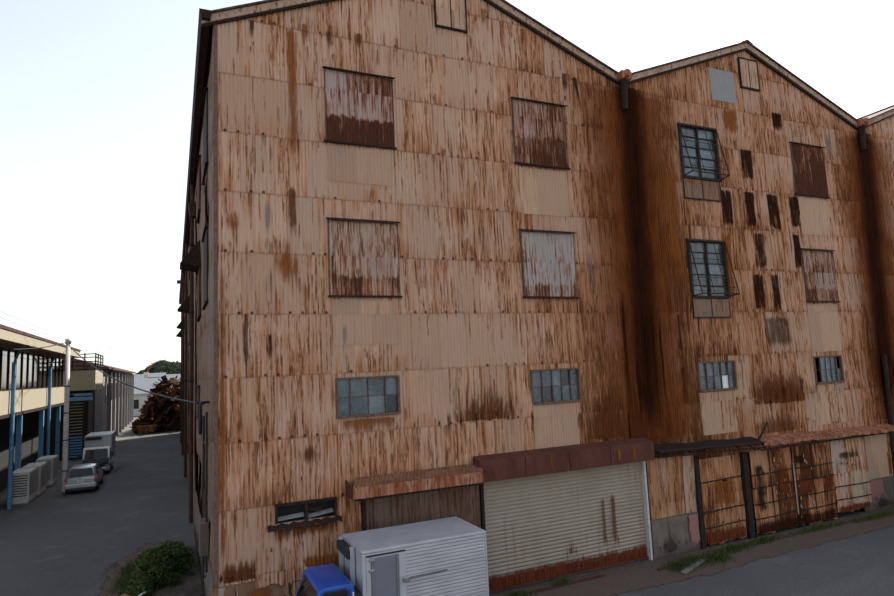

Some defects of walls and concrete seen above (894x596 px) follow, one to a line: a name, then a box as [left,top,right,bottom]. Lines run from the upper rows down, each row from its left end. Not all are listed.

rust [287,23,308,149]
rust [724,110,738,145]
rust [772,112,782,137]
rust [266,243,310,315]
rust [288,186,300,236]
rust [721,190,739,321]
rust [740,148,803,343]
rust [219,213,270,596]
rust [439,383,533,427]
rust [743,370,818,406]
rust [759,454,871,534]
rust [492,495,647,590]